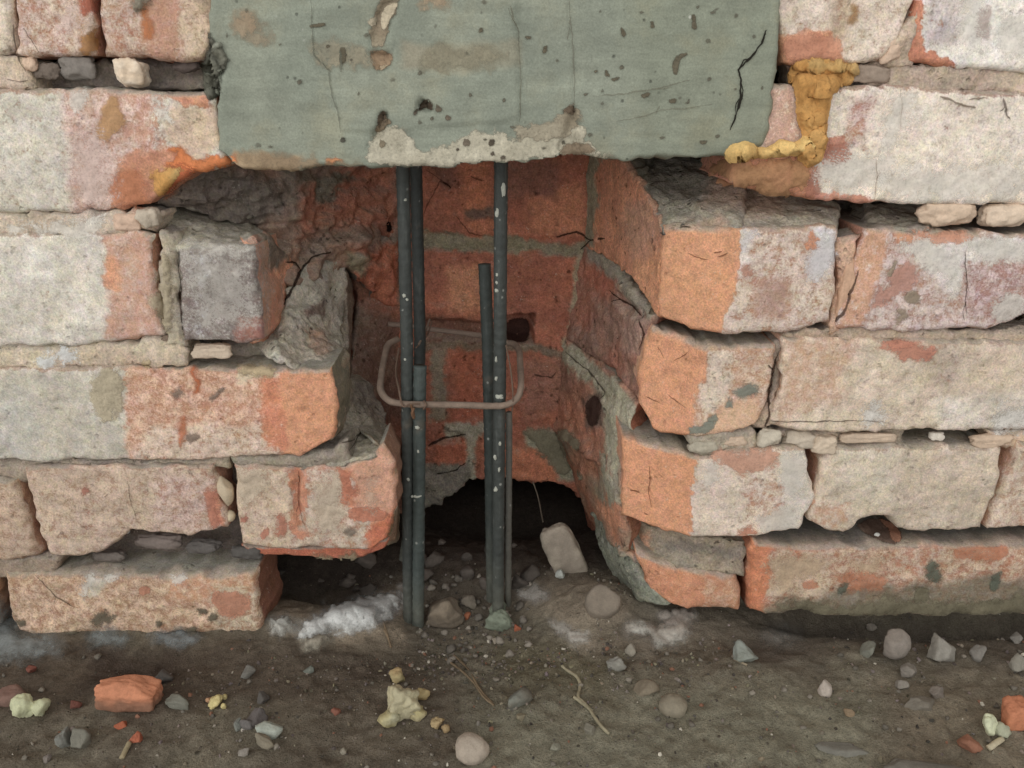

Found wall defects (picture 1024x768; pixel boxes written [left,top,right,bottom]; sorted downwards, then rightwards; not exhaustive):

spalling [672,53,687,75]
crack [730,30,766,130]
spalling [414,99,451,124]
spalling [365,104,612,168]
crack [284,251,331,305]
spalling [507,318,530,342]
spalling [585,396,601,426]
spalling [336,467,386,522]
spalling [260,513,289,539]
spalling [211,591,250,618]
water stain [270,615,292,635]